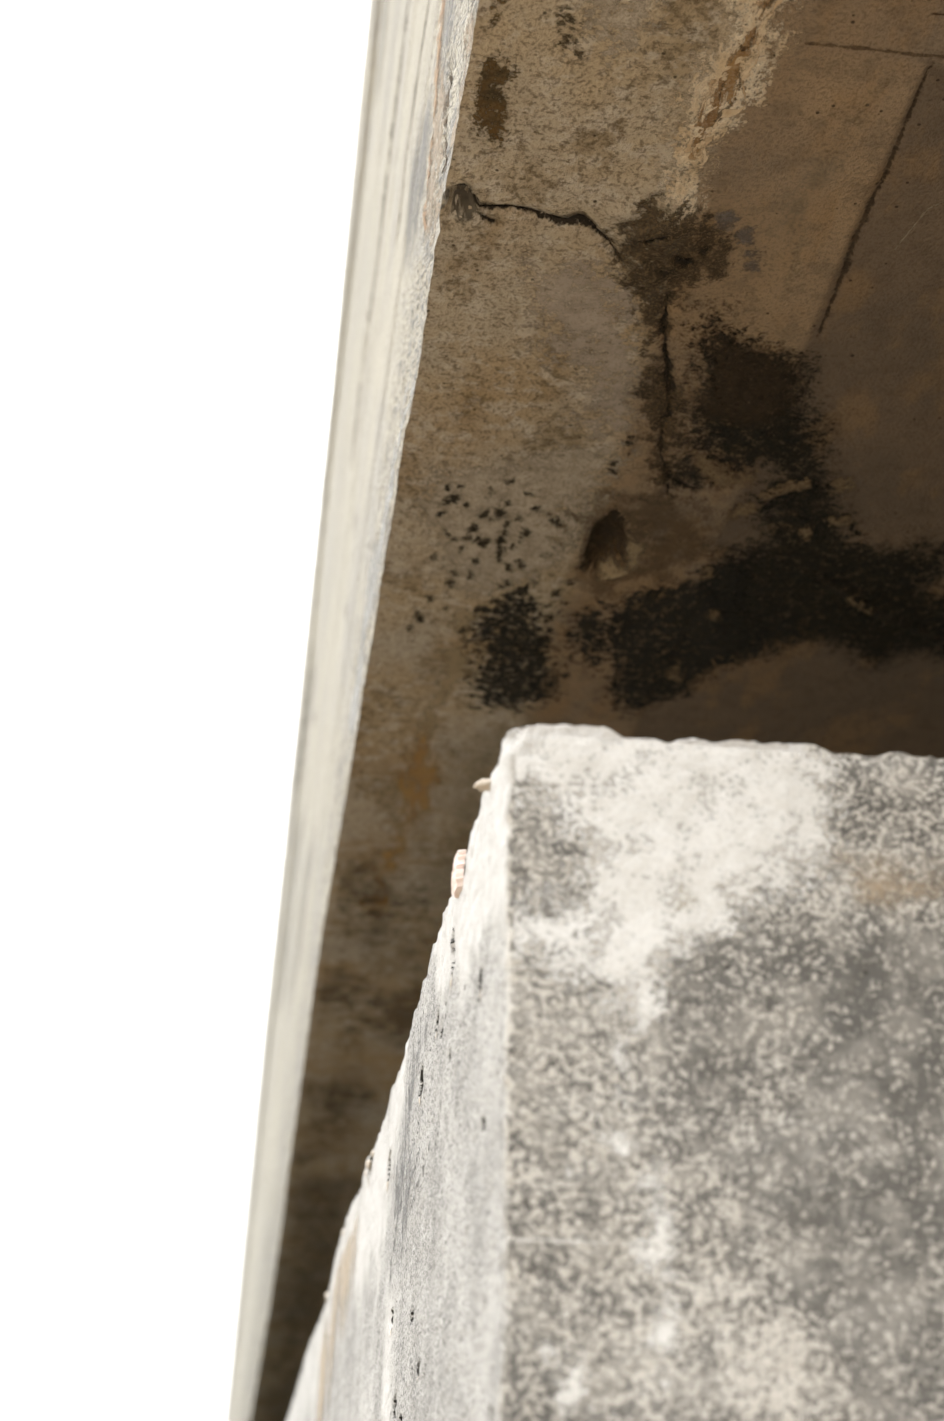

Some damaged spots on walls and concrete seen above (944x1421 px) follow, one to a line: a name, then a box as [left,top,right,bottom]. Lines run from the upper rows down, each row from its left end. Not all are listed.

crack [352,2,710,495]
water stain [416,0,944,739]